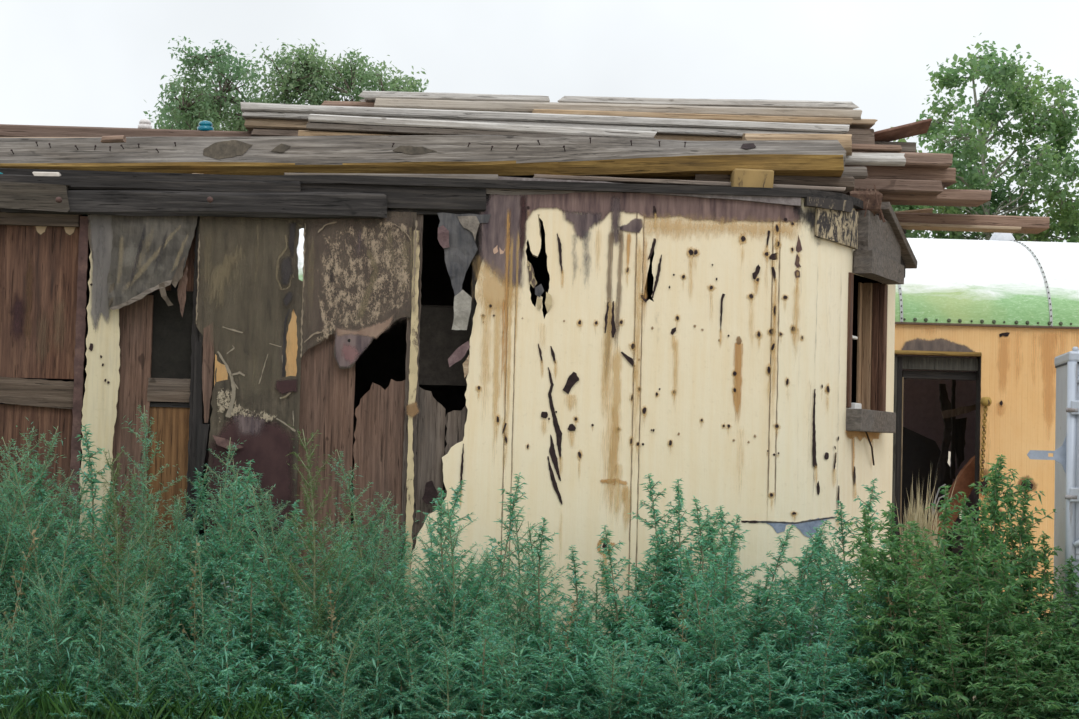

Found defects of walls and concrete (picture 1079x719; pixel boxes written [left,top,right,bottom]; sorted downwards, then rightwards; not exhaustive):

peeling [89,214,113,328]
peeling [300,220,418,357]
crack [538,344,562,504]
corrosion [482,192,815,393]
corrosion [718,335,743,413]
corrosion [902,338,975,352]